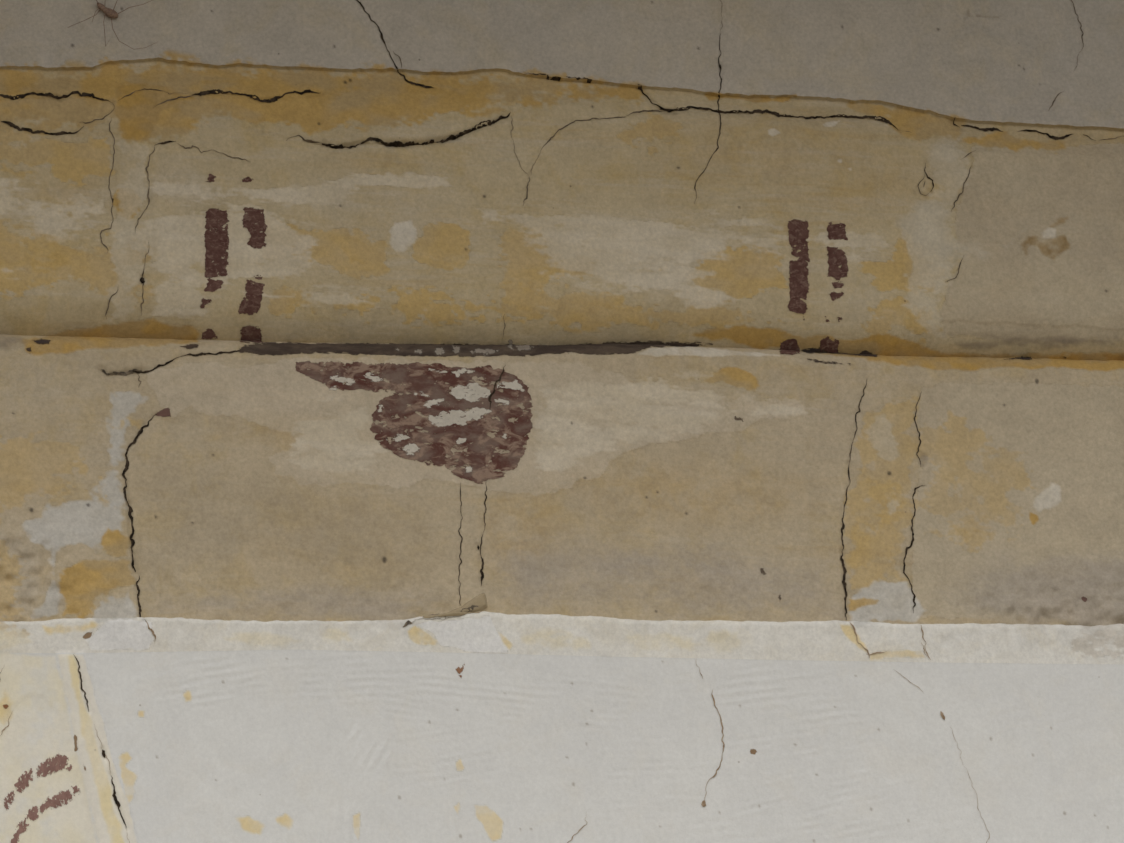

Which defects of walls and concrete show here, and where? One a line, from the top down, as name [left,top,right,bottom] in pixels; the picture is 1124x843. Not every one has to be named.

leakage [0,47,686,213]
crack [287,0,911,205]
leakage [844,98,1069,160]
leakage [0,283,202,357]
crack [122,414,156,639]
crack [101,350,236,385]
leakage [0,416,454,653]
peeling [329,372,383,390]
peeling [389,434,420,455]
peeling [414,368,524,408]
leakage [134,196,1124,373]
crack [840,381,990,843]